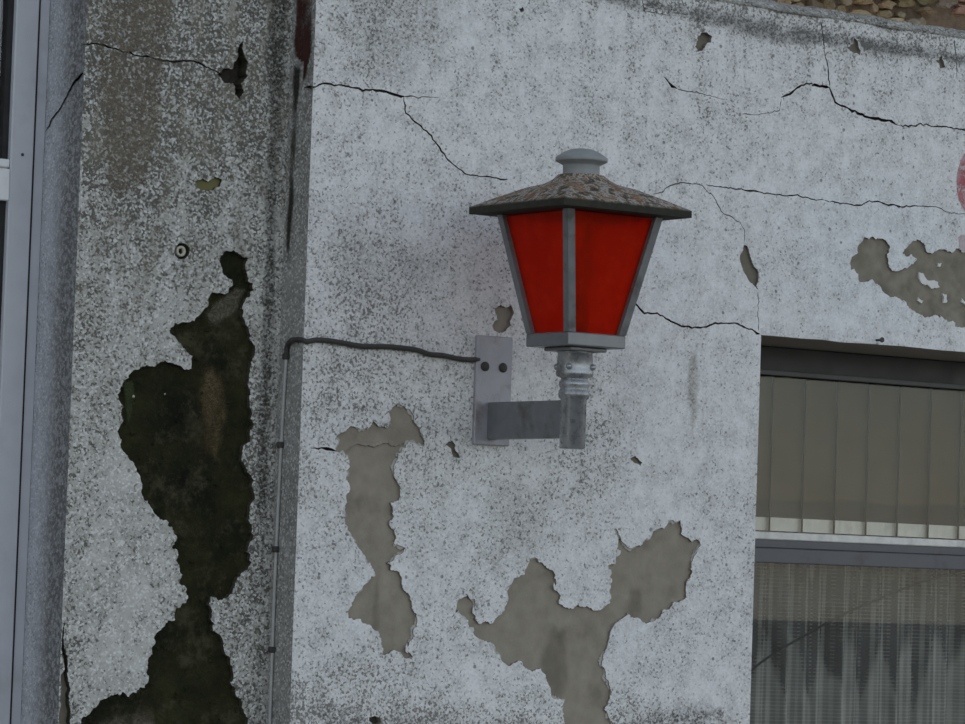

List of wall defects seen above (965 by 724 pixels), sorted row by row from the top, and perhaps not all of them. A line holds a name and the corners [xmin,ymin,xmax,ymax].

crack [46,73,83,130]
crack [83,43,221,75]
spalling [218,42,248,99]
crack [304,82,508,180]
crack [744,23,965,131]
crack [654,182,964,240]
crack [636,297,760,335]
spalling [740,245,759,289]
peeling [850,235,965,328]
peeling [336,404,426,659]
peeling [449,520,701,724]
spalling [59,623,71,724]